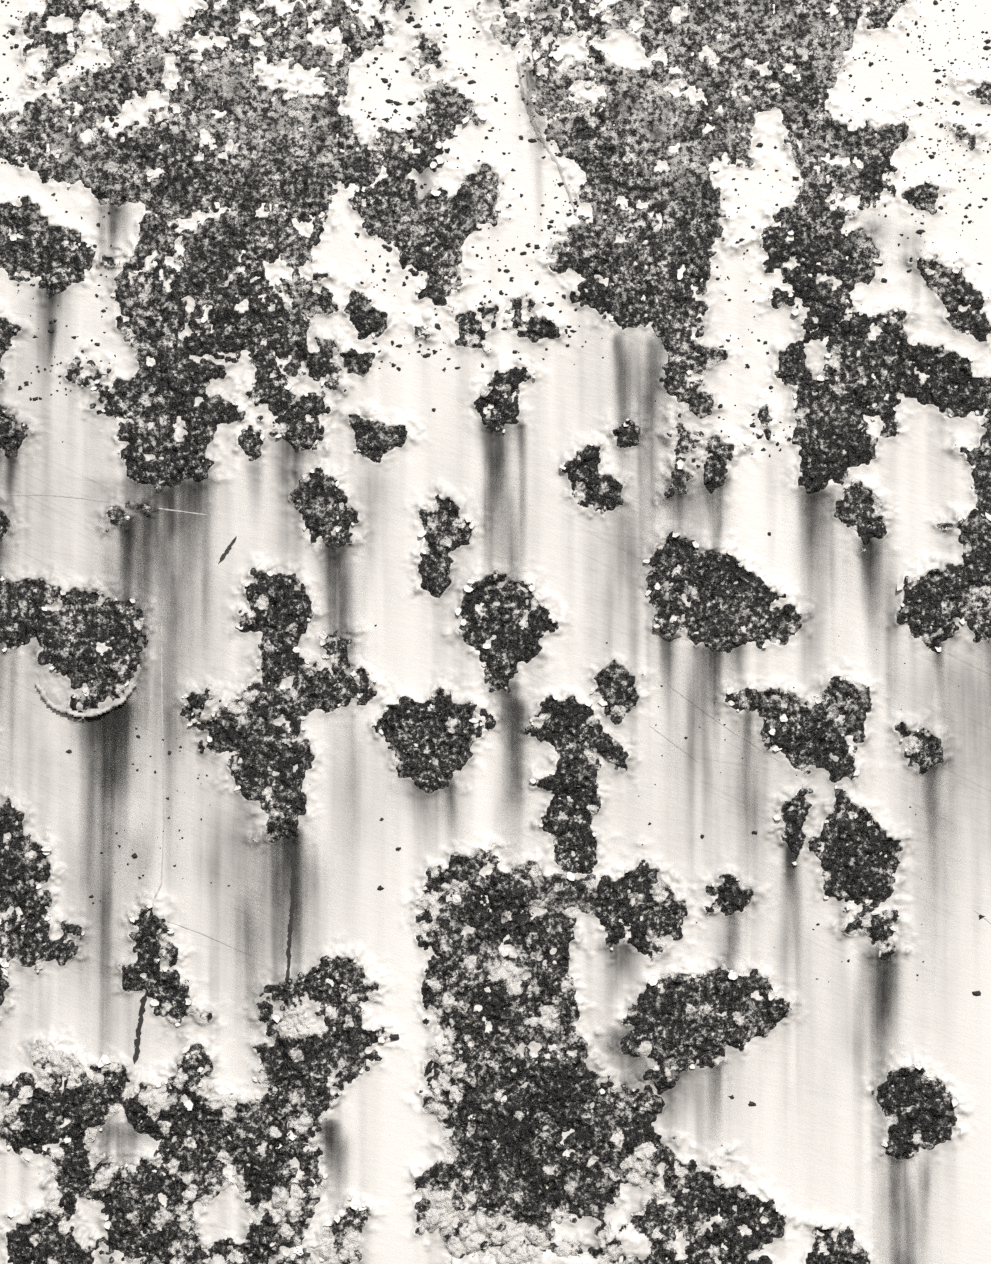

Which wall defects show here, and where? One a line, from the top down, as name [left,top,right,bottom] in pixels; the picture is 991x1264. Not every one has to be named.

peeling [616,1223,651,1261]
peeling [452,1253,496,1264]
peeling [532,1249,597,1264]